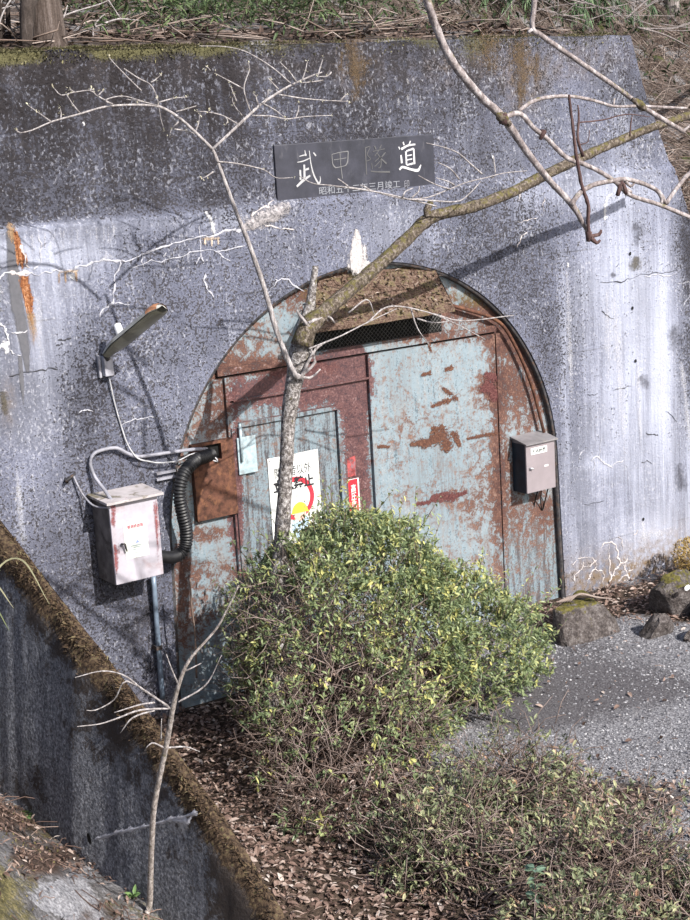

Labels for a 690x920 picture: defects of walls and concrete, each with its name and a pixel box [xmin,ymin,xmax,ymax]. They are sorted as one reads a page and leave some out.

crack [0,200,294,317]
corrosion [7,223,35,404]
crack [0,323,58,377]
corrosion [431,387,458,408]
corrosion [479,371,498,402]
corrosion [410,423,498,453]
corrosion [416,489,468,506]
crack [573,530,638,583]